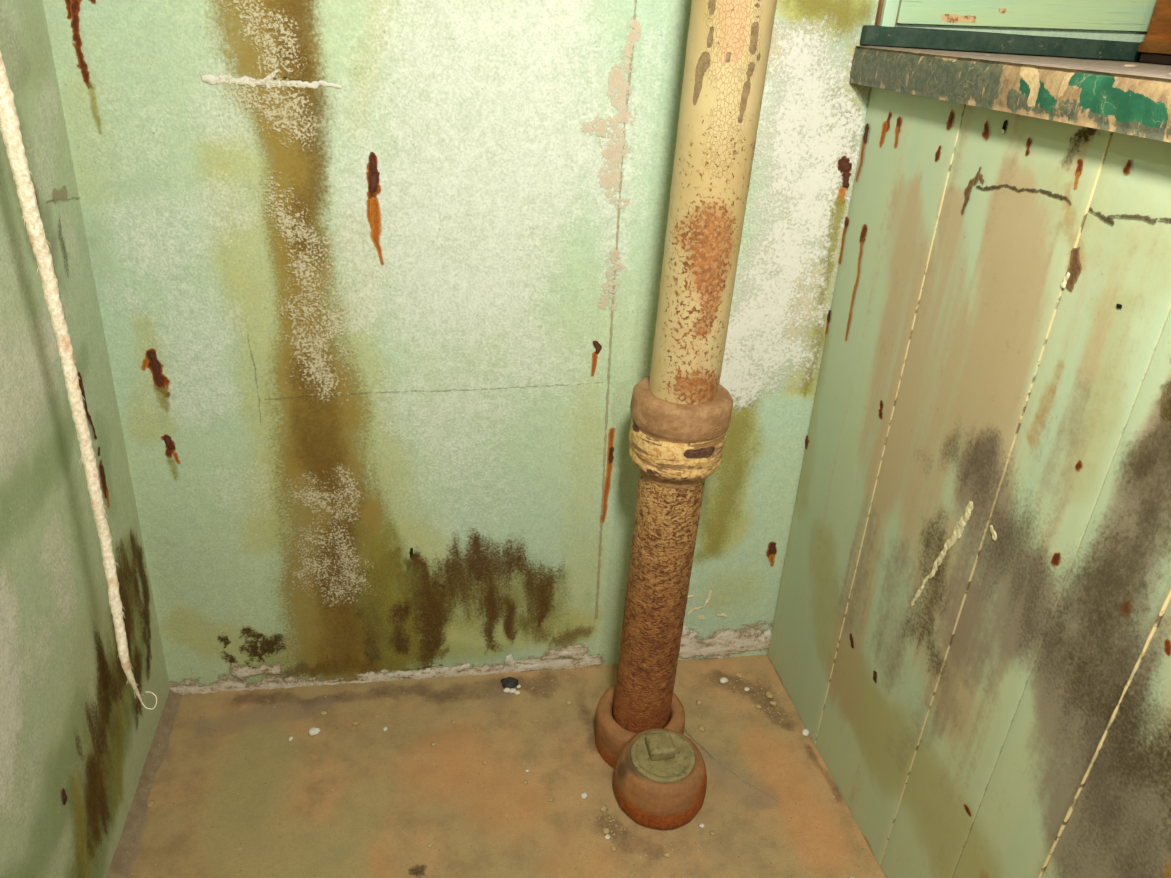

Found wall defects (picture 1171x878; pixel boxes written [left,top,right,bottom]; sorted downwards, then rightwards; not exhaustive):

rust [65,0,101,133]
rust [78,372,110,508]
rust [141,348,170,411]
rust [366,152,384,265]
leakage [210,0,565,682]
peeling [581,18,641,209]
peeling [597,249,626,311]
leakage [698,0,869,558]
rust [829,112,902,273]
crack [961,167,1171,225]
leakage [71,530,152,878]
leakage [990,381,1171,878]